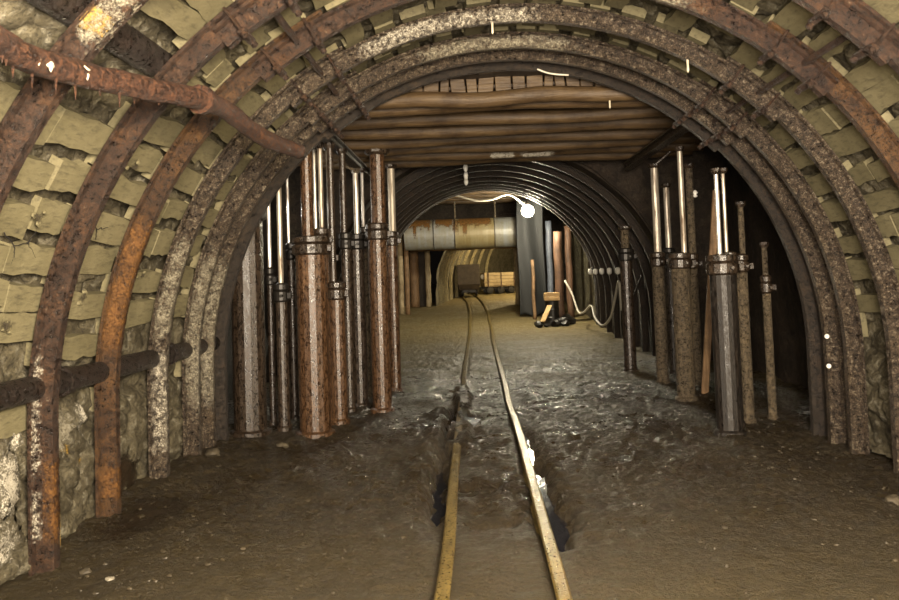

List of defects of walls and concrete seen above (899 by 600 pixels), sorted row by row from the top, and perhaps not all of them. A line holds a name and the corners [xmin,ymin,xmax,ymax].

rust [81,4,110,37]
rust [102,222,152,354]
rust [43,444,68,545]